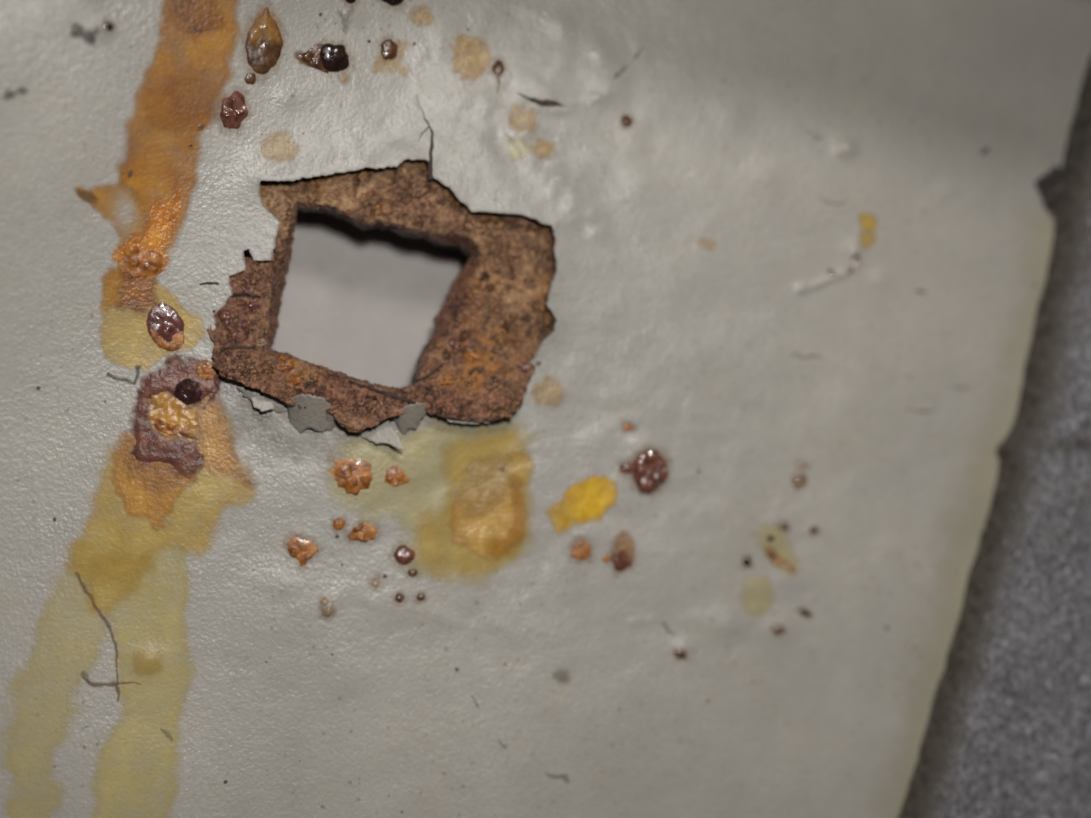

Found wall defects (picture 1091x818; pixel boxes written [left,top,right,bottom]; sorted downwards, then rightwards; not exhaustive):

crack [416,94,434,180]
rust [860,214,877,246]
rust [73,0,562,818]
rust [550,450,669,531]
rust [761,527,796,572]